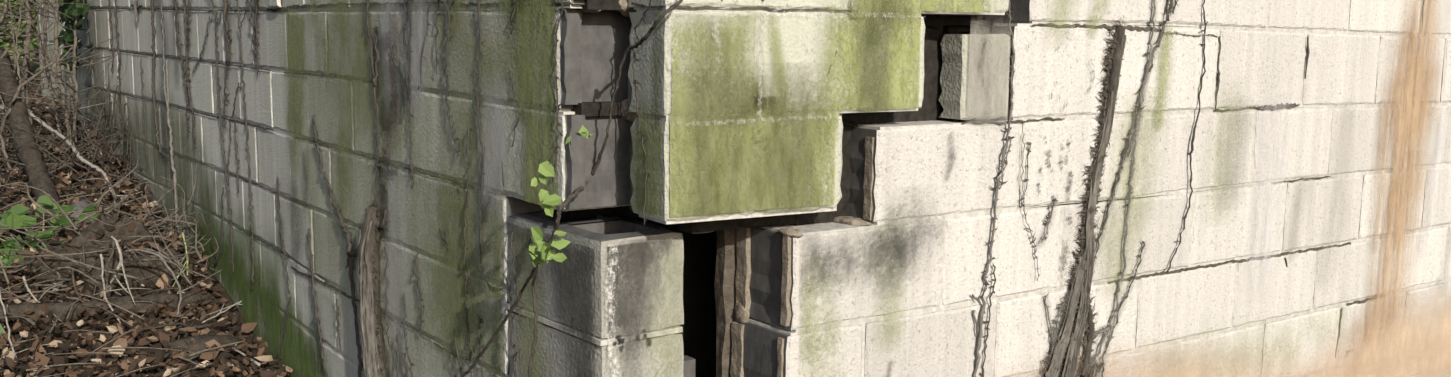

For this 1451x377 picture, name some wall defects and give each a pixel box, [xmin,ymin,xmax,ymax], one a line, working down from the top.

crack [86,0,1065,377]
water stain [691,96,744,217]
water stain [771,22,811,211]
water stain [861,5,891,112]
crack [1032,23,1299,112]
crack [1274,175,1331,183]
crack [1303,36,1311,79]
corrosion [1366,0,1435,344]
crack [1109,242,1351,284]